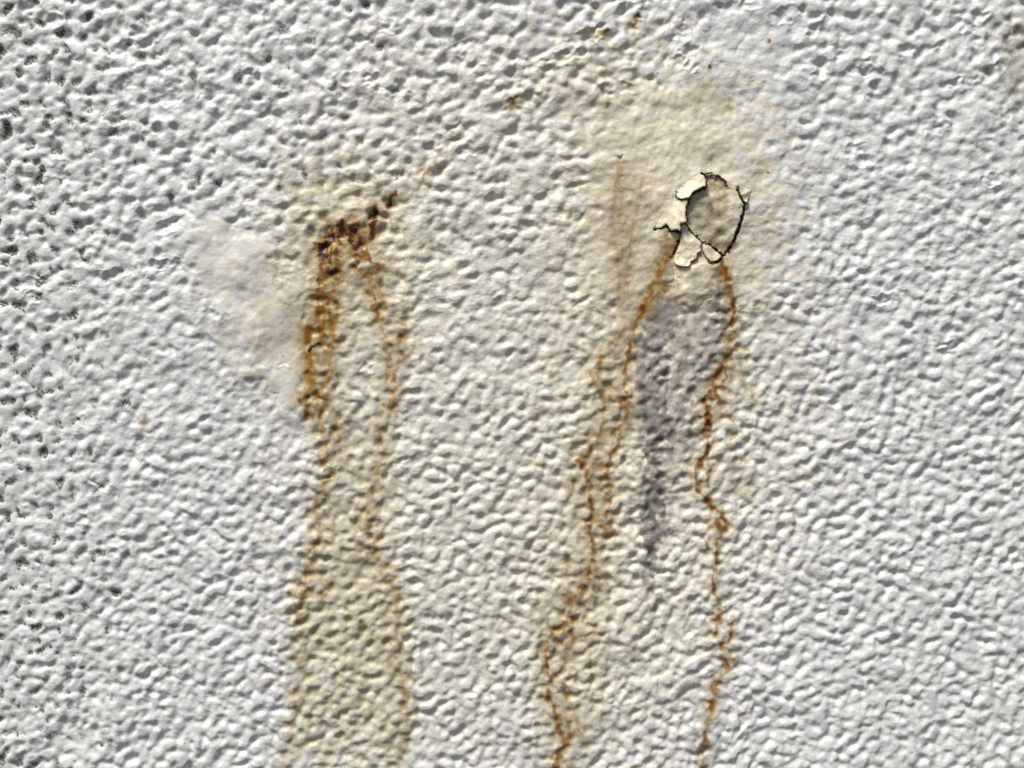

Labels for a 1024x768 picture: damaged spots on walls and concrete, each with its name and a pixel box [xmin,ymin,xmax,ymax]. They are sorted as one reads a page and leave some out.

corrosion [294,565,318,636]
corrosion [297,190,408,548]
corrosion [542,245,678,768]
corrosion [611,155,644,285]
peeling [653,172,752,308]
corrosion [694,259,739,768]